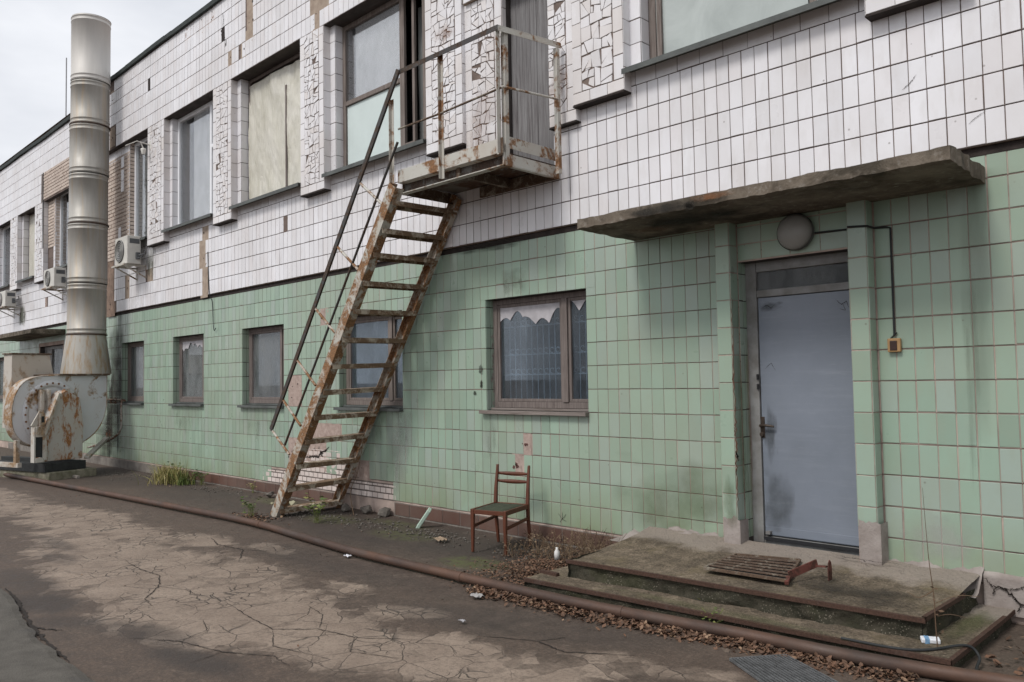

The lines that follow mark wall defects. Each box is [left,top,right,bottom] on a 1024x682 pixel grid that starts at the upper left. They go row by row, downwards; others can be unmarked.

spalling [185,0,256,67]
spalling [199,225,209,298]
spalling [289,375,302,406]
flaking render [262,436,297,484]
flaking render [296,423,396,502]
spalling [512,433,531,477]
crack [127,562,196,605]
crack [983,578,1024,612]
crack [5,588,69,662]
crack [128,603,312,665]
crack [311,607,431,658]